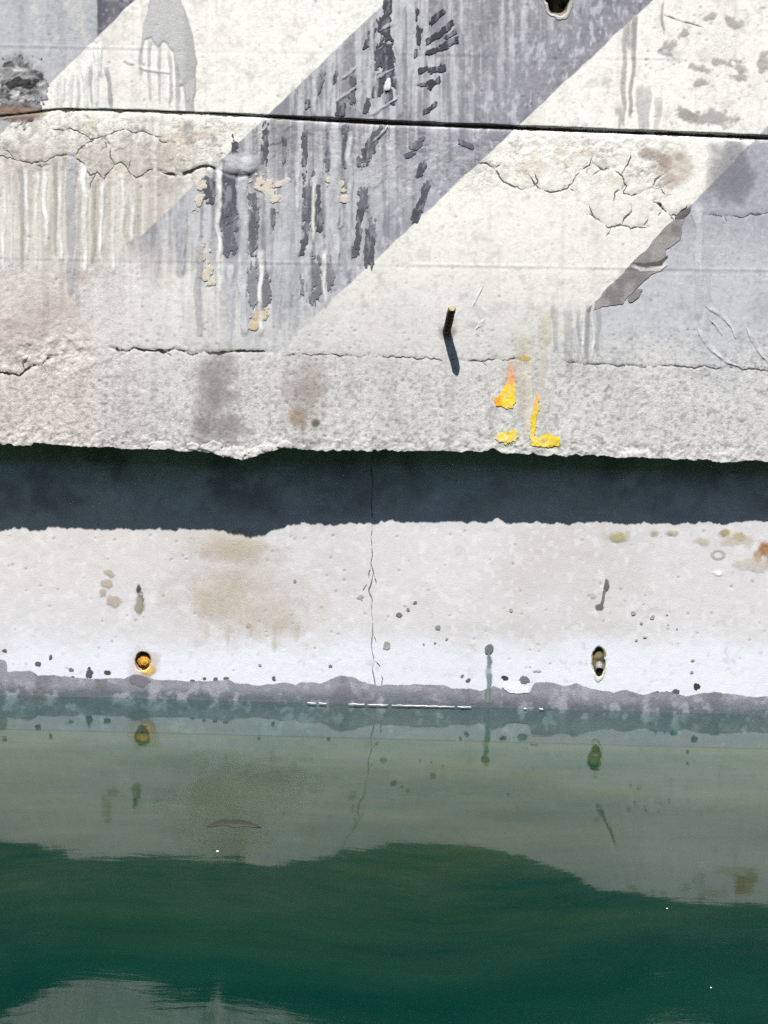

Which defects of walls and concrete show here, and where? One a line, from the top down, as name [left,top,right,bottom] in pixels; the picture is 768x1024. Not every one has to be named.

spalling [0,54,50,130]
water stain [124,0,197,110]
water stain [1,151,134,292]
crack [0,126,261,185]
peeling [190,0,400,330]
peeling [404,136,431,223]
crack [477,153,768,234]
peeling [587,204,692,311]
peeling [714,145,751,197]
crack [0,354,59,376]
crack [112,347,519,365]
crack [363,456,383,684]